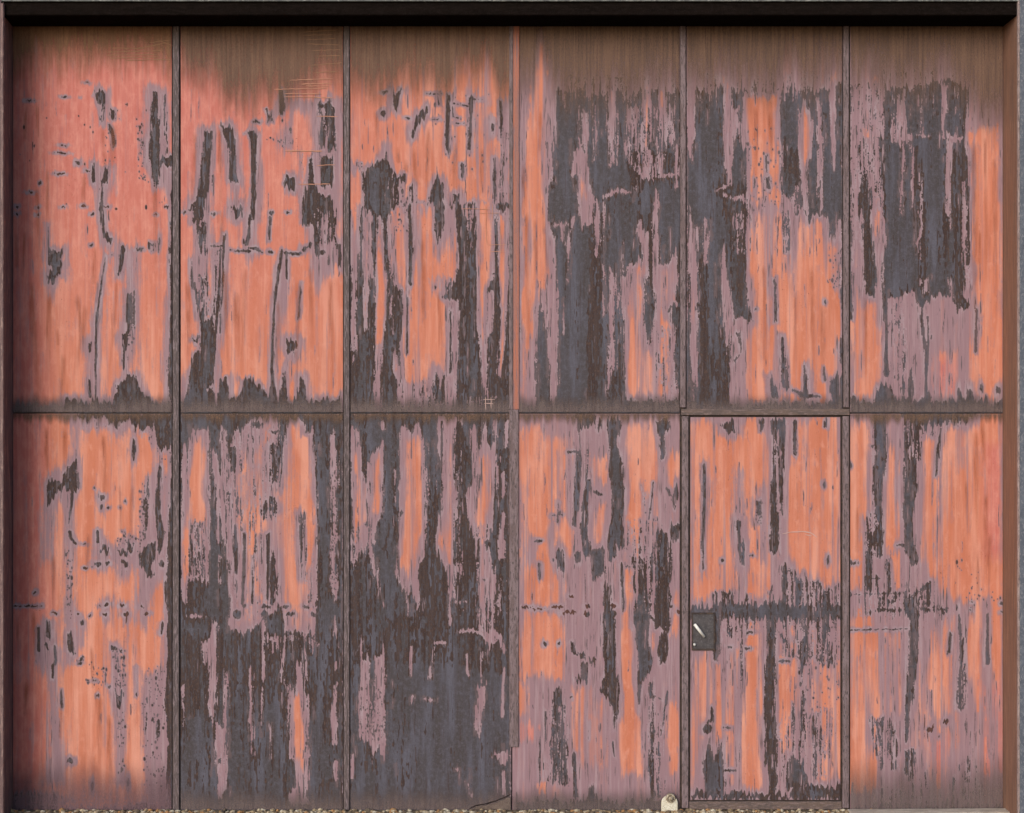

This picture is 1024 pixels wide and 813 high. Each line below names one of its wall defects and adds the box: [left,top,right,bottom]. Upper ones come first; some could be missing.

peeling [36,620,57,679]
peeling [47,88,528,810]
peeling [521,68,990,800]
peeling [985,601,1003,705]